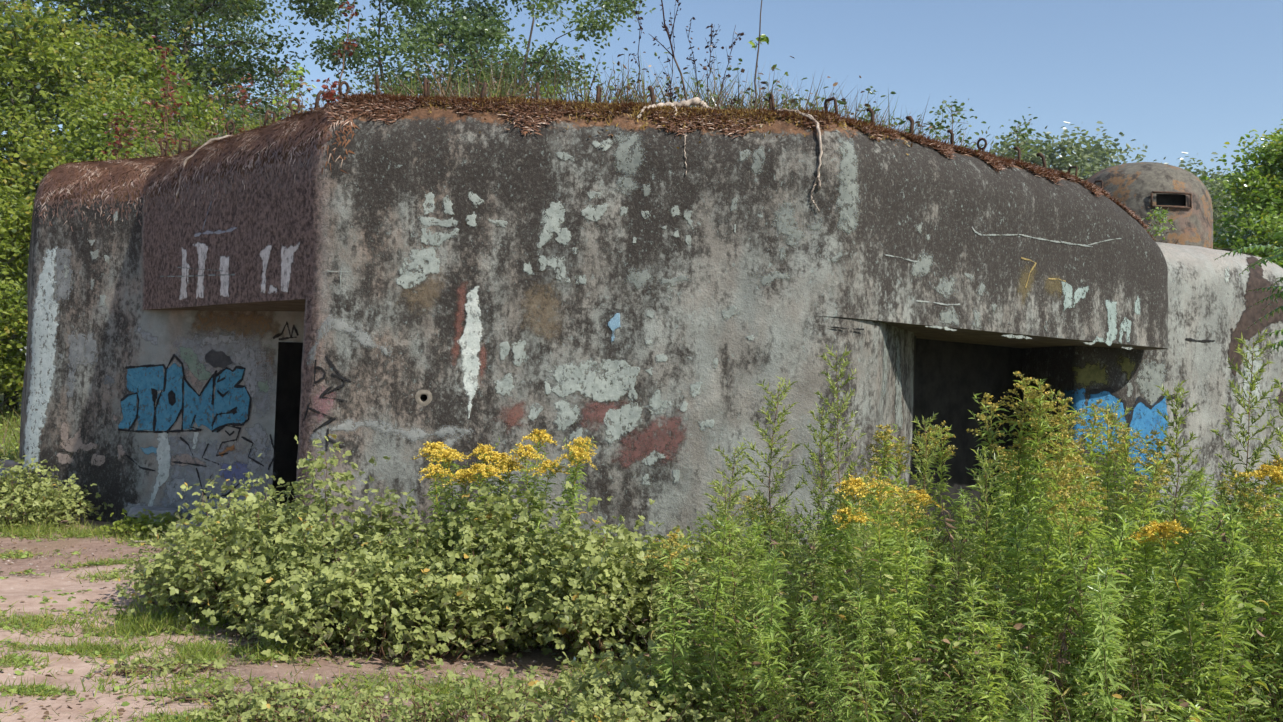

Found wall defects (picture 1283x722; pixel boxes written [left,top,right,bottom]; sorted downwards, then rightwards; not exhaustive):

peeling [395,192,508,289]
peeling [523,131,701,284]
damp [836,138,860,234]
crack [972,227,1121,288]
damp [23,247,73,469]
peeling [528,339,715,446]
damp [1093,296,1141,346]